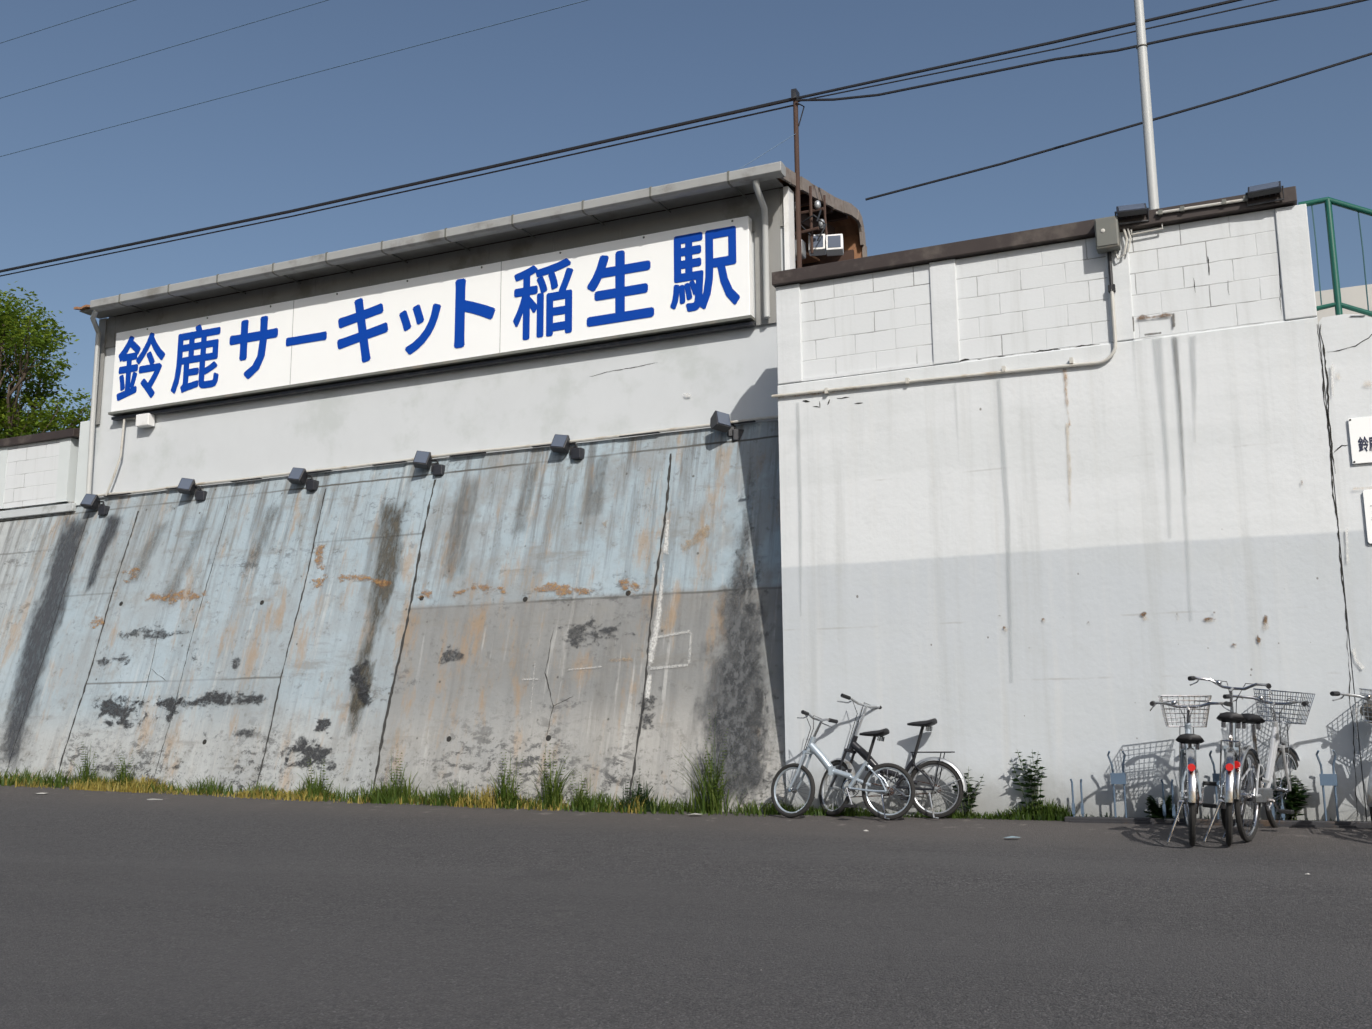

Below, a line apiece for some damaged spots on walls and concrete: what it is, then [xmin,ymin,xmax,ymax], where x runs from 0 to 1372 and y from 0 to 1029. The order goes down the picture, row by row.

water stain [5,520,83,761]
water stain [87,516,119,588]
rust [147,590,206,604]
water stain [279,719,336,772]
water stain [350,504,406,729]
water stain [697,531,768,802]
crack [1317,325,1372,816]